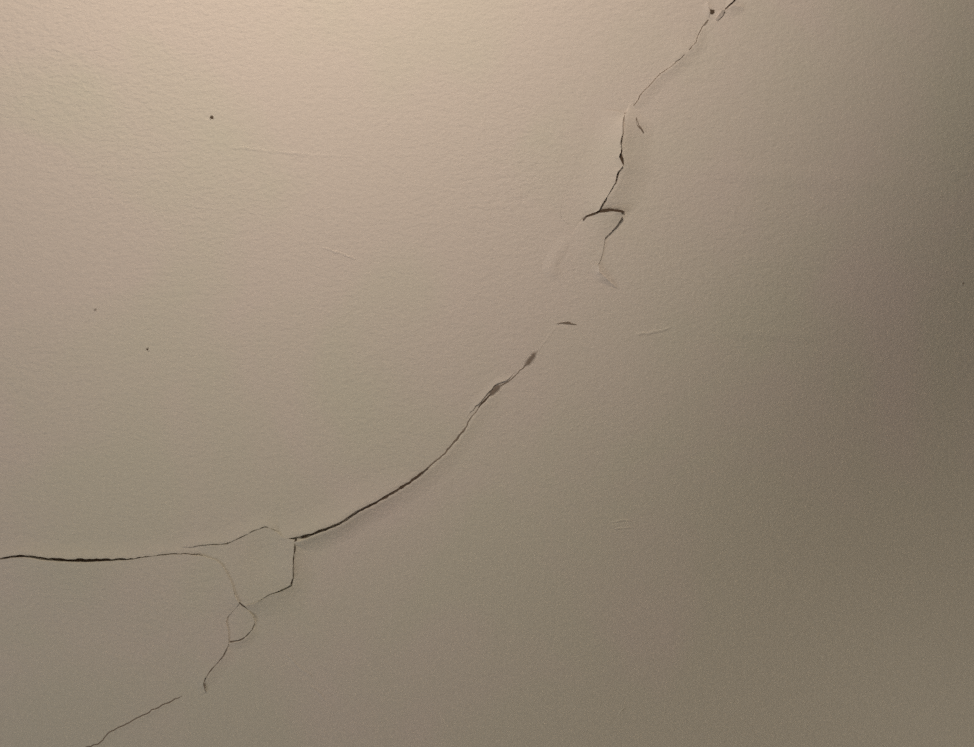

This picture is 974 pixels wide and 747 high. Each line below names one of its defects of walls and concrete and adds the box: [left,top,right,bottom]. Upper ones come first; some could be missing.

crack [633,0,744,109]
peeling [542,98,654,288]
crack [278,322,577,553]
crack [79,696,180,747]